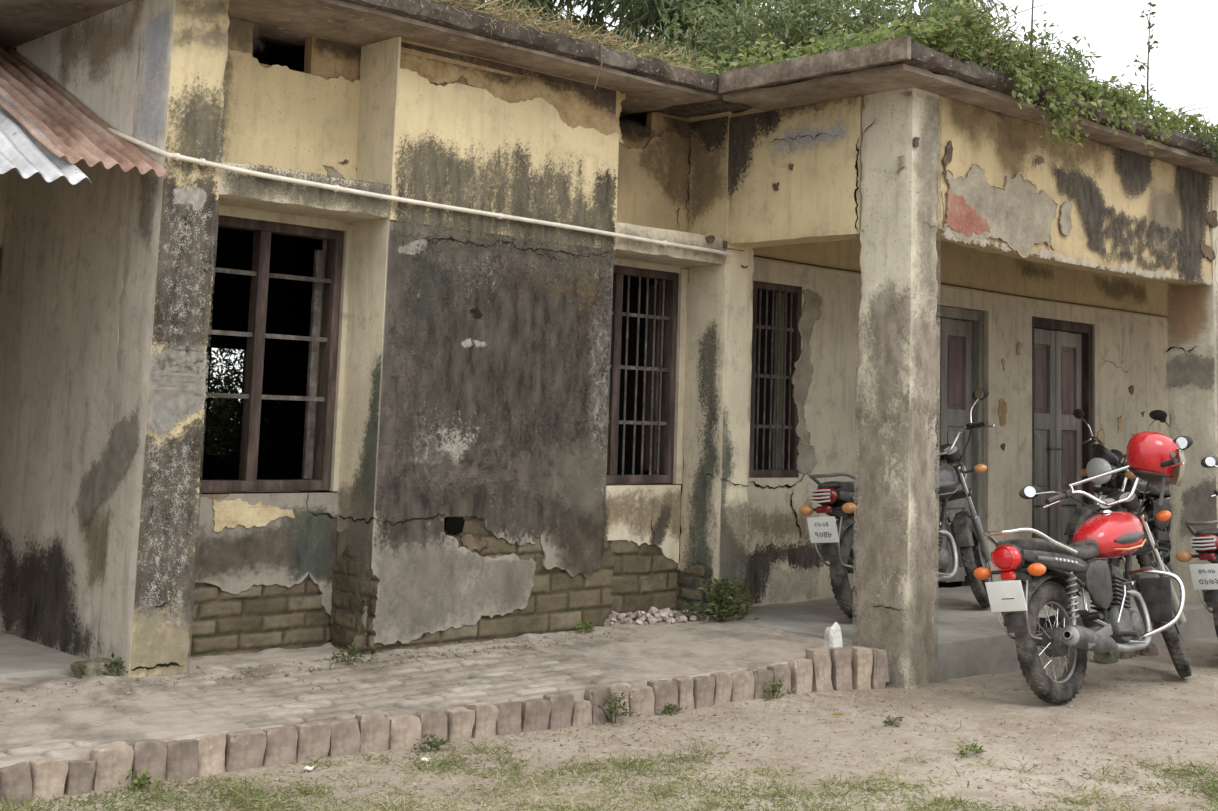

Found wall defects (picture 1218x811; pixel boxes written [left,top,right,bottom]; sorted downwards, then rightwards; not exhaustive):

damp [139,62,232,352]
crack [394,235,613,260]
spalling [400,39,626,144]
damp [619,120,723,217]
peeling [942,140,1072,258]
damp [953,100,1211,285]
damp [0,129,681,676]
crack [306,494,443,525]
flaking render [135,178,752,657]
damp [695,319,749,616]
peeling [791,289,822,475]